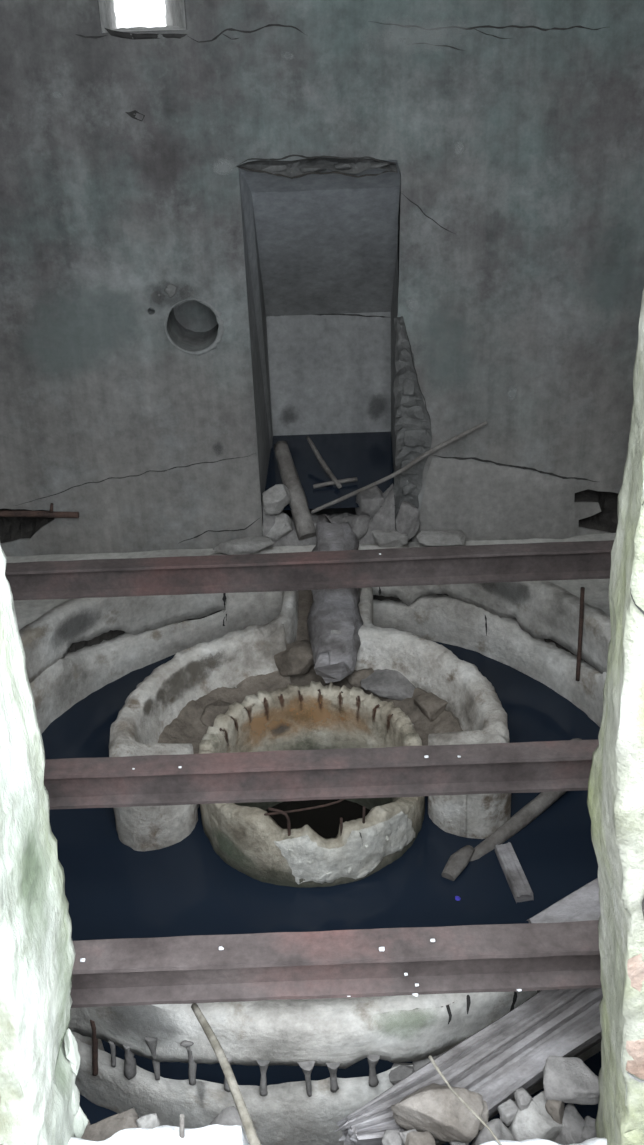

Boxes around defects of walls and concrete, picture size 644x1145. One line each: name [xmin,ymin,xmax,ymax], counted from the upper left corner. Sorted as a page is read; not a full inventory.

crack [188,24,308,42]
crack [368,21,605,51]
crack [15,454,253,506]
crack [434,455,596,482]
spalling [574,489,618,533]
crack [178,517,261,544]
rust [219,694,284,743]
rust [338,691,393,729]
spalling [264,799,415,884]